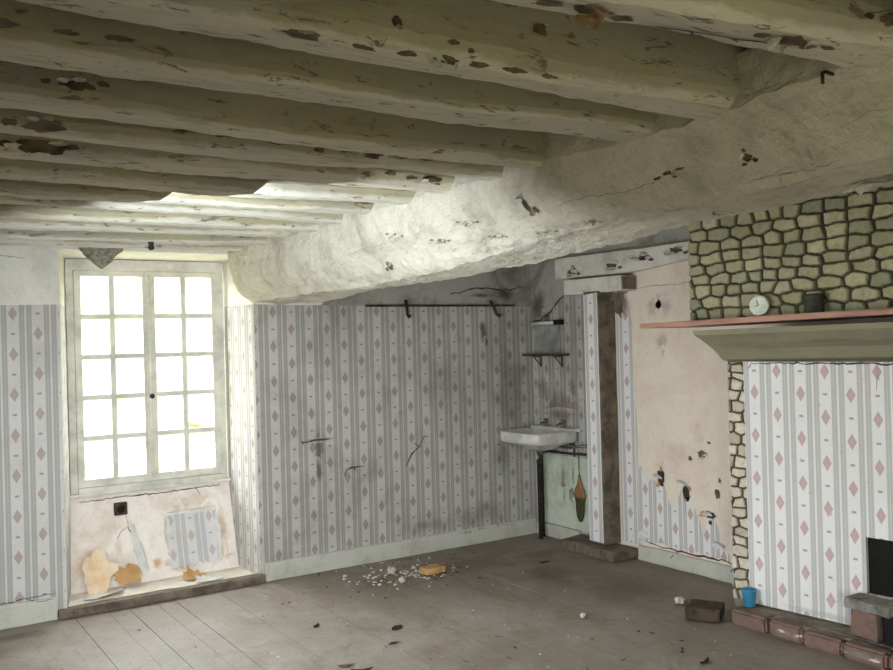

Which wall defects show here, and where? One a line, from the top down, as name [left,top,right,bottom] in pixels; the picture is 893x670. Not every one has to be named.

peeling [271,28,332,47]
peeling [392,15,403,30]
peeling [533,23,552,37]
peeling [536,1,634,31]
peeling [753,33,835,56]
peeling [864,10,893,27]
peeling [396,39,491,71]
peeling [40,77,110,91]
peeling [0,116,80,157]